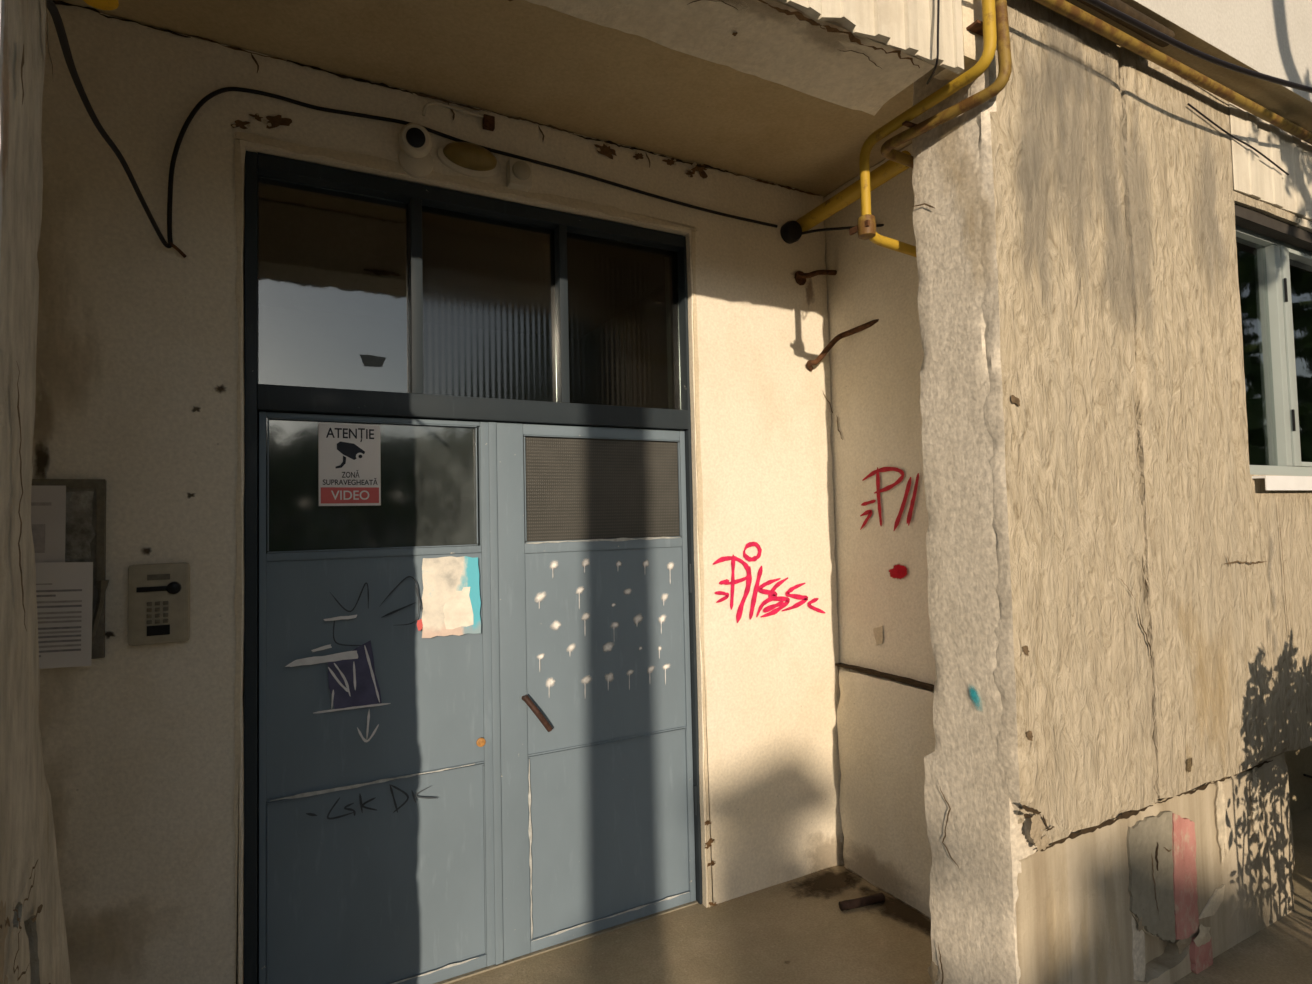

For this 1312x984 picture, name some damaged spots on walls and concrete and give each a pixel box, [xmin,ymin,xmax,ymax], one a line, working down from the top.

spalling [758,0,920,68]
crack [1036,760,1273,852]
crack [0,860,51,984]
spalling [1136,884,1225,964]